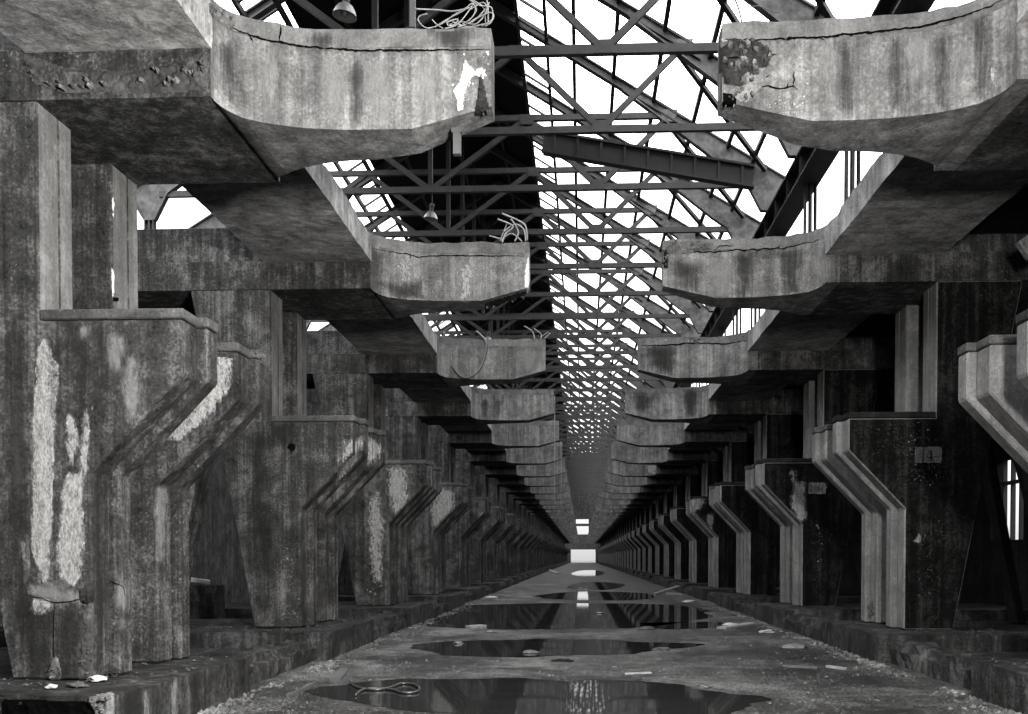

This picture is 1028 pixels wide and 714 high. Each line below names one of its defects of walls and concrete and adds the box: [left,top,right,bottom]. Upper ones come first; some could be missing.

spalling [24,52,208,94]
water stain [263,57,279,114]
water stain [324,59,389,116]
water stain [437,28,465,46]
spalling [451,51,489,116]
spalling [719,37,810,116]
crack [728,0,1001,89]
spalling [658,239,713,268]
water stain [99,326,138,416]
water stain [168,357,233,441]
water stain [8,316,103,673]
water stain [116,586,127,610]